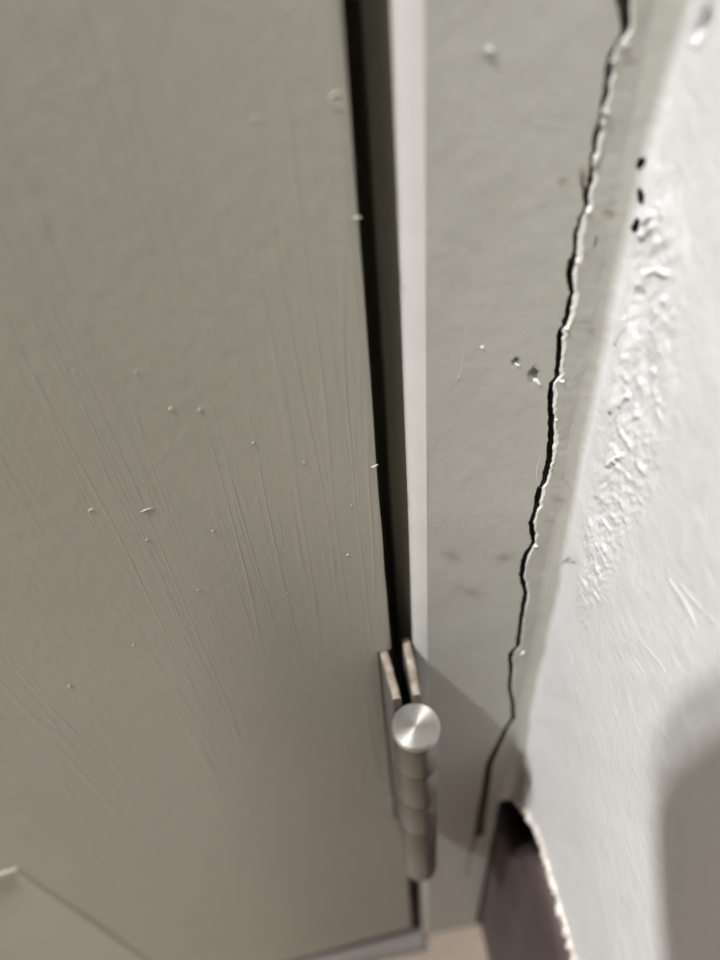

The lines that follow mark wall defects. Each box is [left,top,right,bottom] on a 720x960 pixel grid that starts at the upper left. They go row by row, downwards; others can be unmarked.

crack [467,0,635,875]
spalling [498,796,578,960]